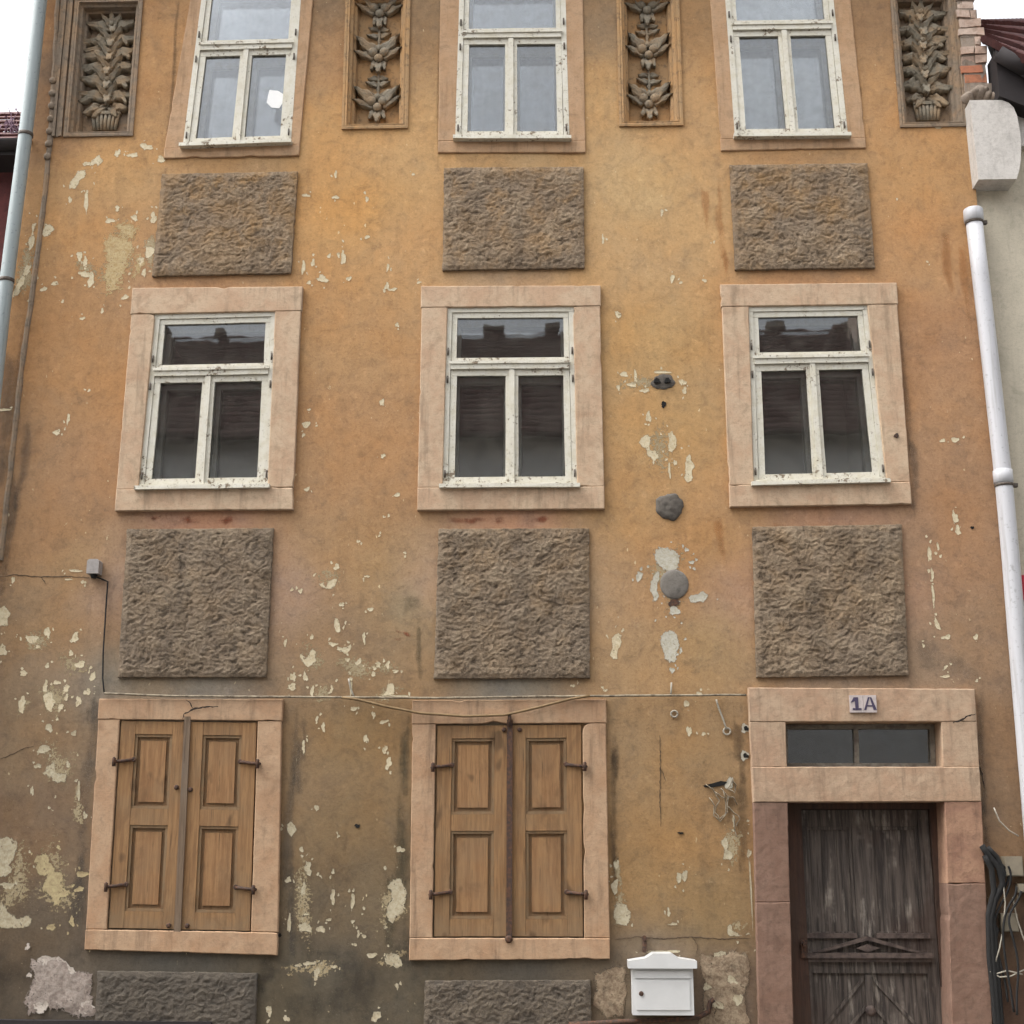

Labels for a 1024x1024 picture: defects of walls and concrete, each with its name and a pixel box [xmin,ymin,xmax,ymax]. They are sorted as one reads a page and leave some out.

peeling [63,140,165,213]
peeling [71,205,157,314]
peeling [639,411,695,482]
peeling [0,606,96,824]
crack [183,700,218,718]
peeling [287,561,410,754]
peeling [632,541,718,674]
crack [658,735,666,821]
peeling [0,835,89,935]
peeling [281,847,410,990]
spalling [698,816,756,1024]
spalling [23,943,96,1020]